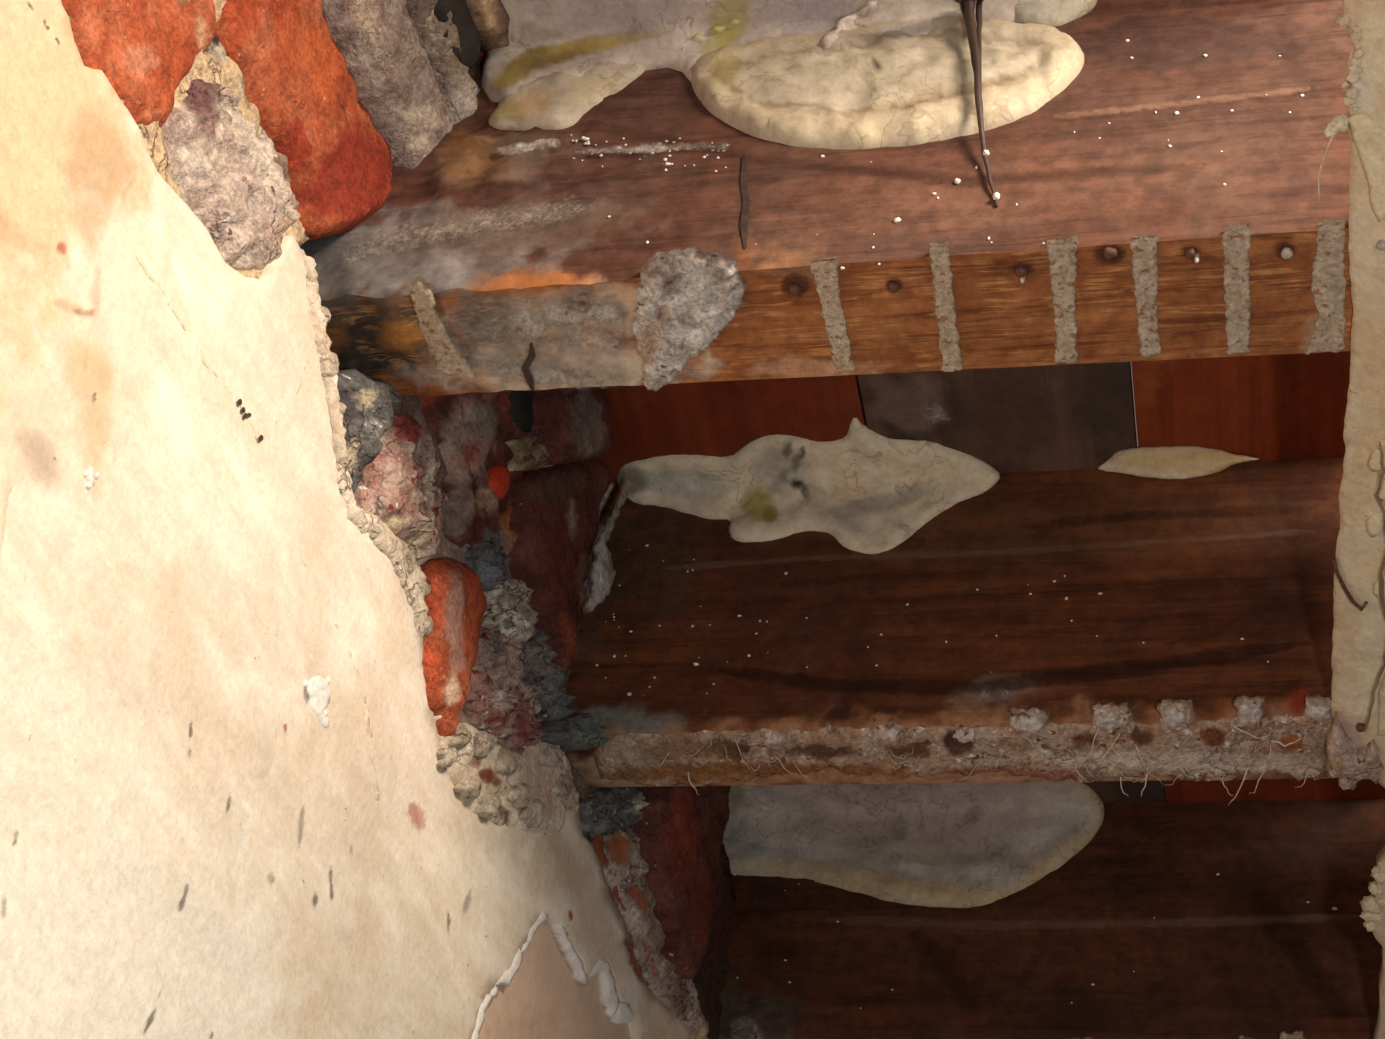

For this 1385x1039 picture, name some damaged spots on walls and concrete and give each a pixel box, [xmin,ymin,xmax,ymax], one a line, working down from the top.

flaking render [1336,13,1365,112]
water stain [488,359,626,386]
water stain [508,302,623,354]
spalling [61,0,731,1039]
flaking render [1366,439,1385,538]
flaking render [1326,673,1385,790]
flaking render [1360,859,1385,938]